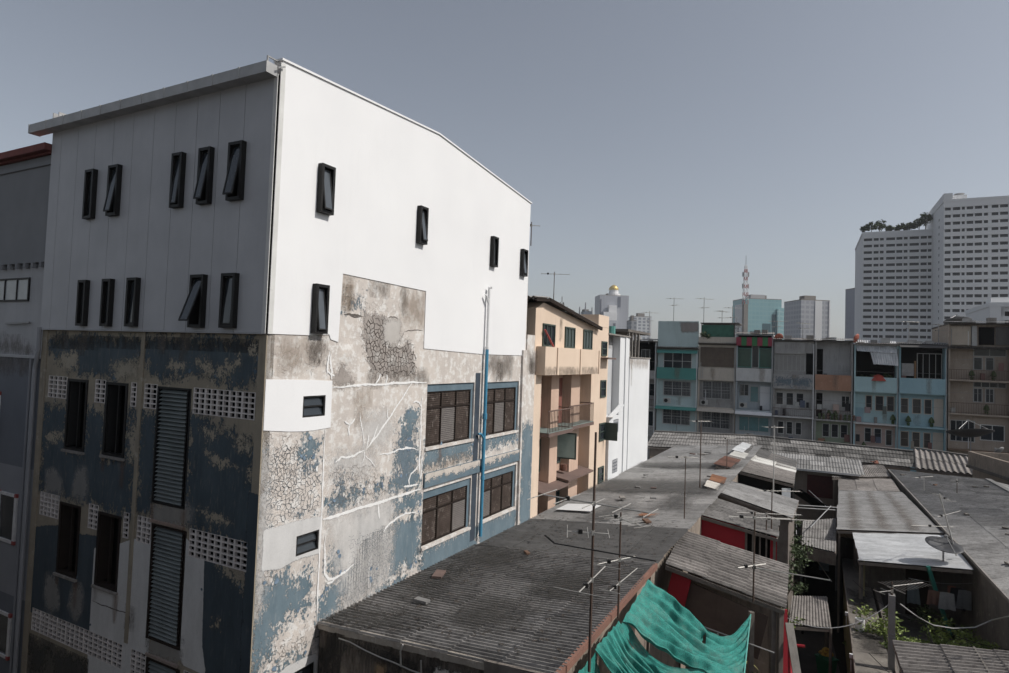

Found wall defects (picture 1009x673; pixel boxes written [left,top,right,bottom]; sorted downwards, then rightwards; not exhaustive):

peeling [48,331,258,392]
crack [257,296,427,615]
peeling [183,407,533,673]
flaking render [340,287,414,381]